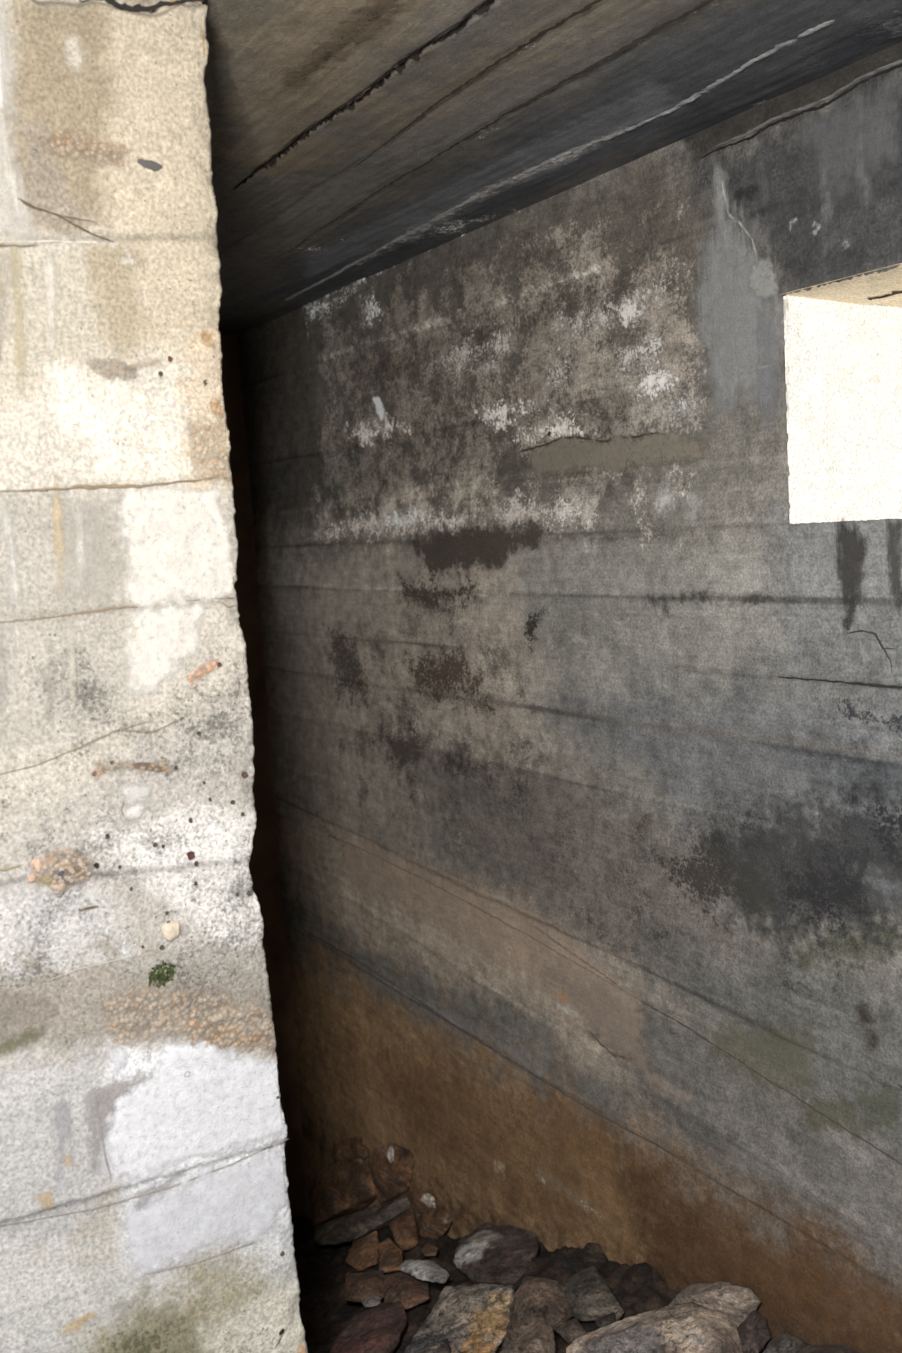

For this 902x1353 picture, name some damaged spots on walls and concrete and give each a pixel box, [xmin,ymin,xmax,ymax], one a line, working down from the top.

crack [80,0,205,13]
crack [234,0,500,189]
crack [288,0,716,253]
crack [701,59,902,158]
damp [801,69,899,252]
damp [472,159,786,457]
damp [344,412,411,454]
damp [316,483,601,618]
damp [836,521,866,630]
damp [887,521,902,607]
crack [780,630,902,688]
damp [649,775,902,956]